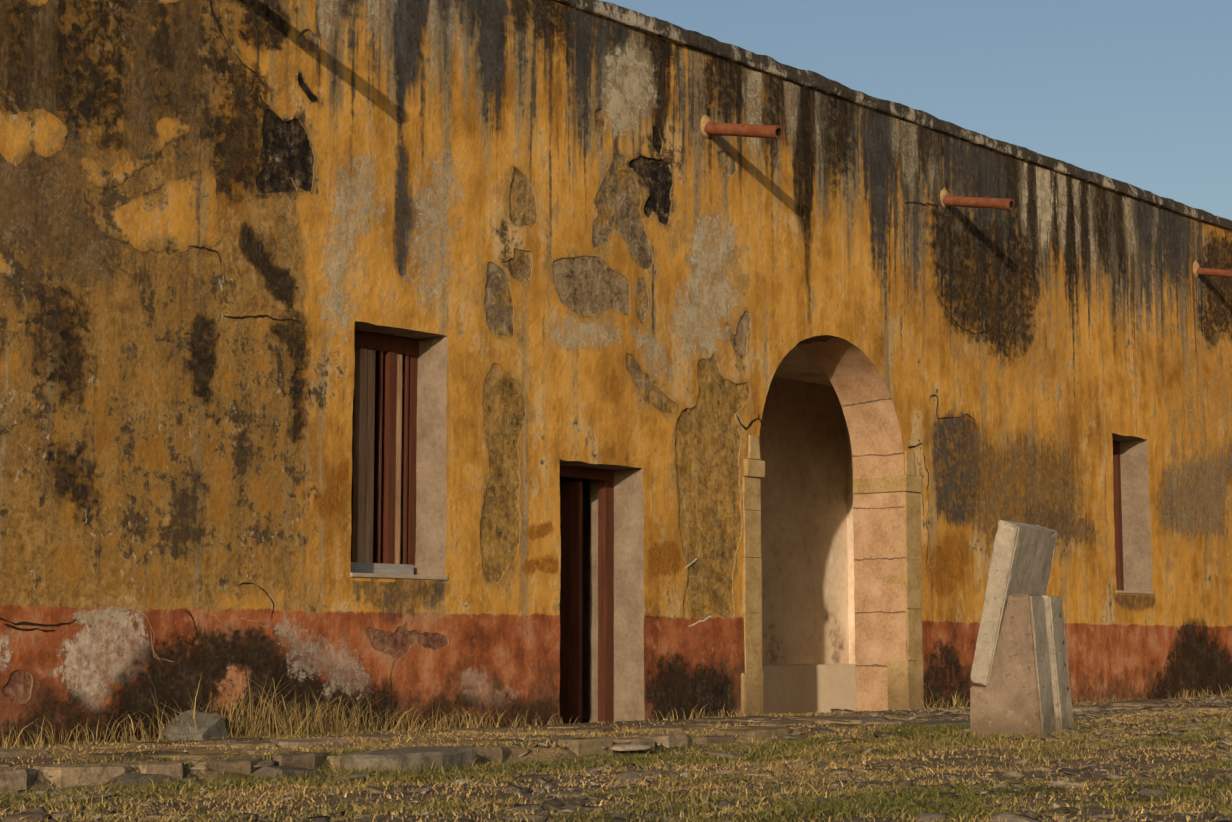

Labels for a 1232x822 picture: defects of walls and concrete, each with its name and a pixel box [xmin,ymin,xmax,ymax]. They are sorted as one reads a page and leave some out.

leakage [202,60,271,201]
leakage [239,222,310,440]
spalling [255,109,315,194]
leakage [318,0,671,330]
spalling [484,248,533,337]
spalling [552,126,674,324]
leakage [705,56,1232,364]
spalling [479,363,526,582]
spalling [625,352,751,620]
leakage [933,413,1095,549]
crack [0,618,76,632]
leakage [0,607,400,746]